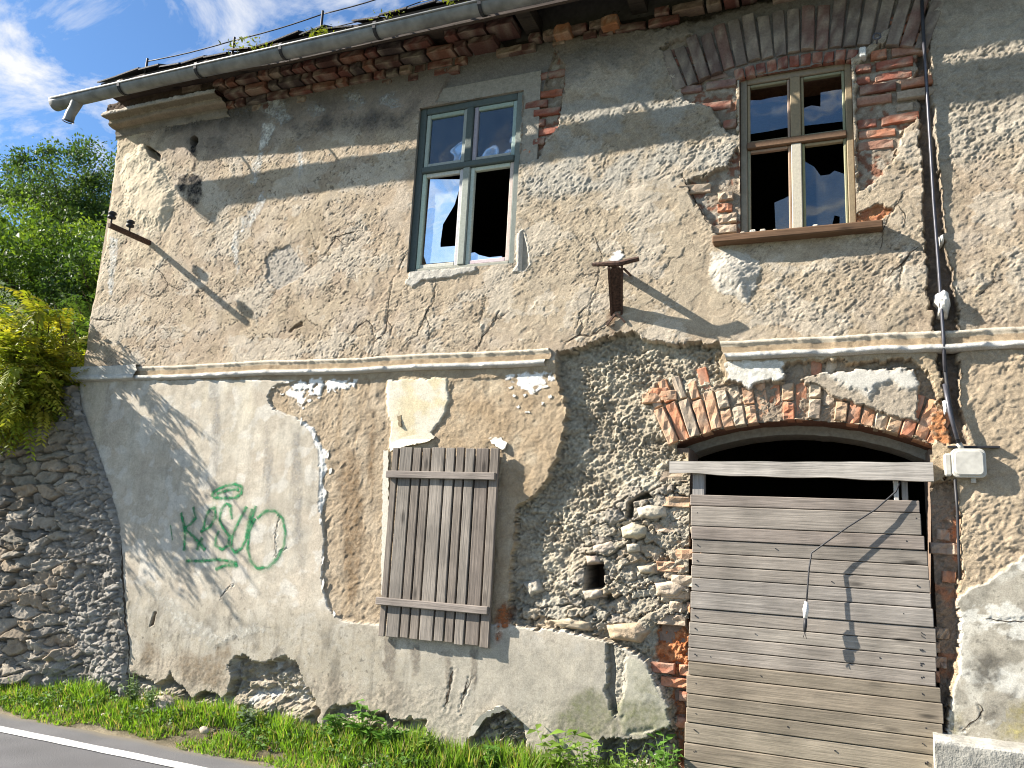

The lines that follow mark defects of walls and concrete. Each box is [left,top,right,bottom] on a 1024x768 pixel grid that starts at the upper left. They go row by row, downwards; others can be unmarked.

flaking render [521,49,566,159]
flaking render [661,33,740,235]
flaking render [855,0,934,191]
flaking render [856,203,894,222]
crack [343,251,435,352]
crack [476,297,509,350]
spalling [269,330,952,768]
spalling [126,653,427,740]
crack [444,671,471,709]